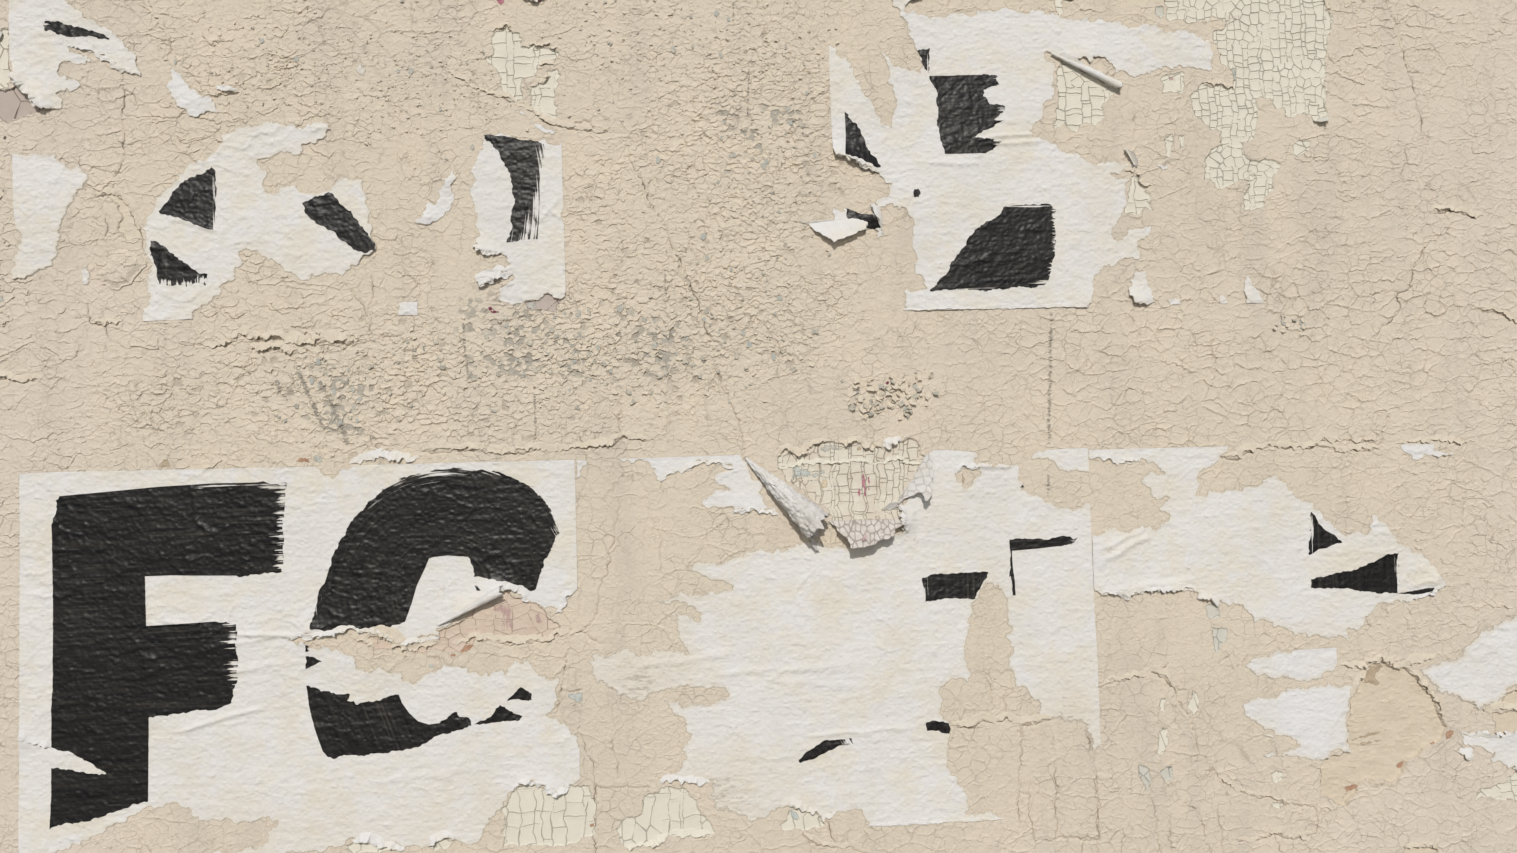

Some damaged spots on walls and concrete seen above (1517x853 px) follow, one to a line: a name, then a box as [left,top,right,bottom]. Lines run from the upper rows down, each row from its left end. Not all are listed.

peeling [1053,61,1119,132]
peeling [1155,0,1333,210]
crack [197,279,402,354]
peeling [172,0,853,459]
crack [445,69,745,450]
crack [350,412,659,464]
peeling [777,371,939,521]
crack [1221,423,1475,461]
crack [365,509,620,708]
peeling [502,785,603,847]
peeling [617,786,715,851]
crack [953,665,1319,853]